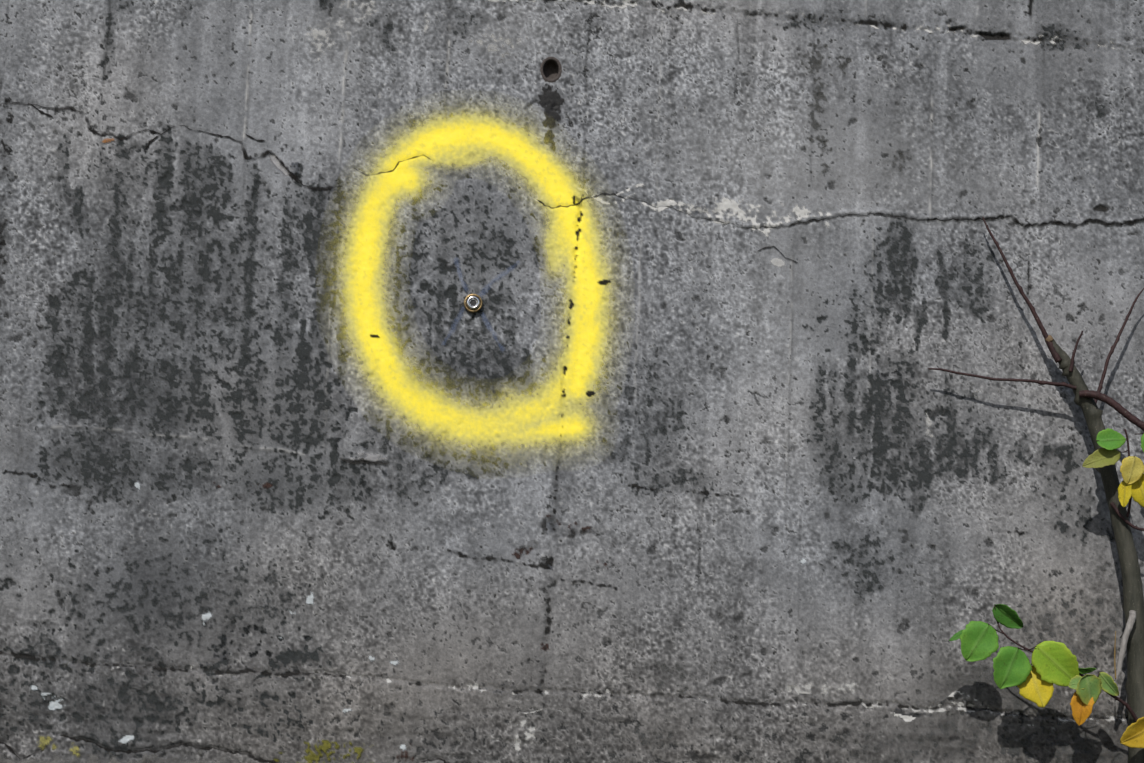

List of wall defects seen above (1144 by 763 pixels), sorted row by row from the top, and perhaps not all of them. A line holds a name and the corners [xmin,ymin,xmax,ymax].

crack [13,102,333,191]
leakage [34,120,522,519]
crack [354,156,431,176]
leakage [388,176,546,406]
crack [538,193,1144,263]
leakage [803,213,1095,546]